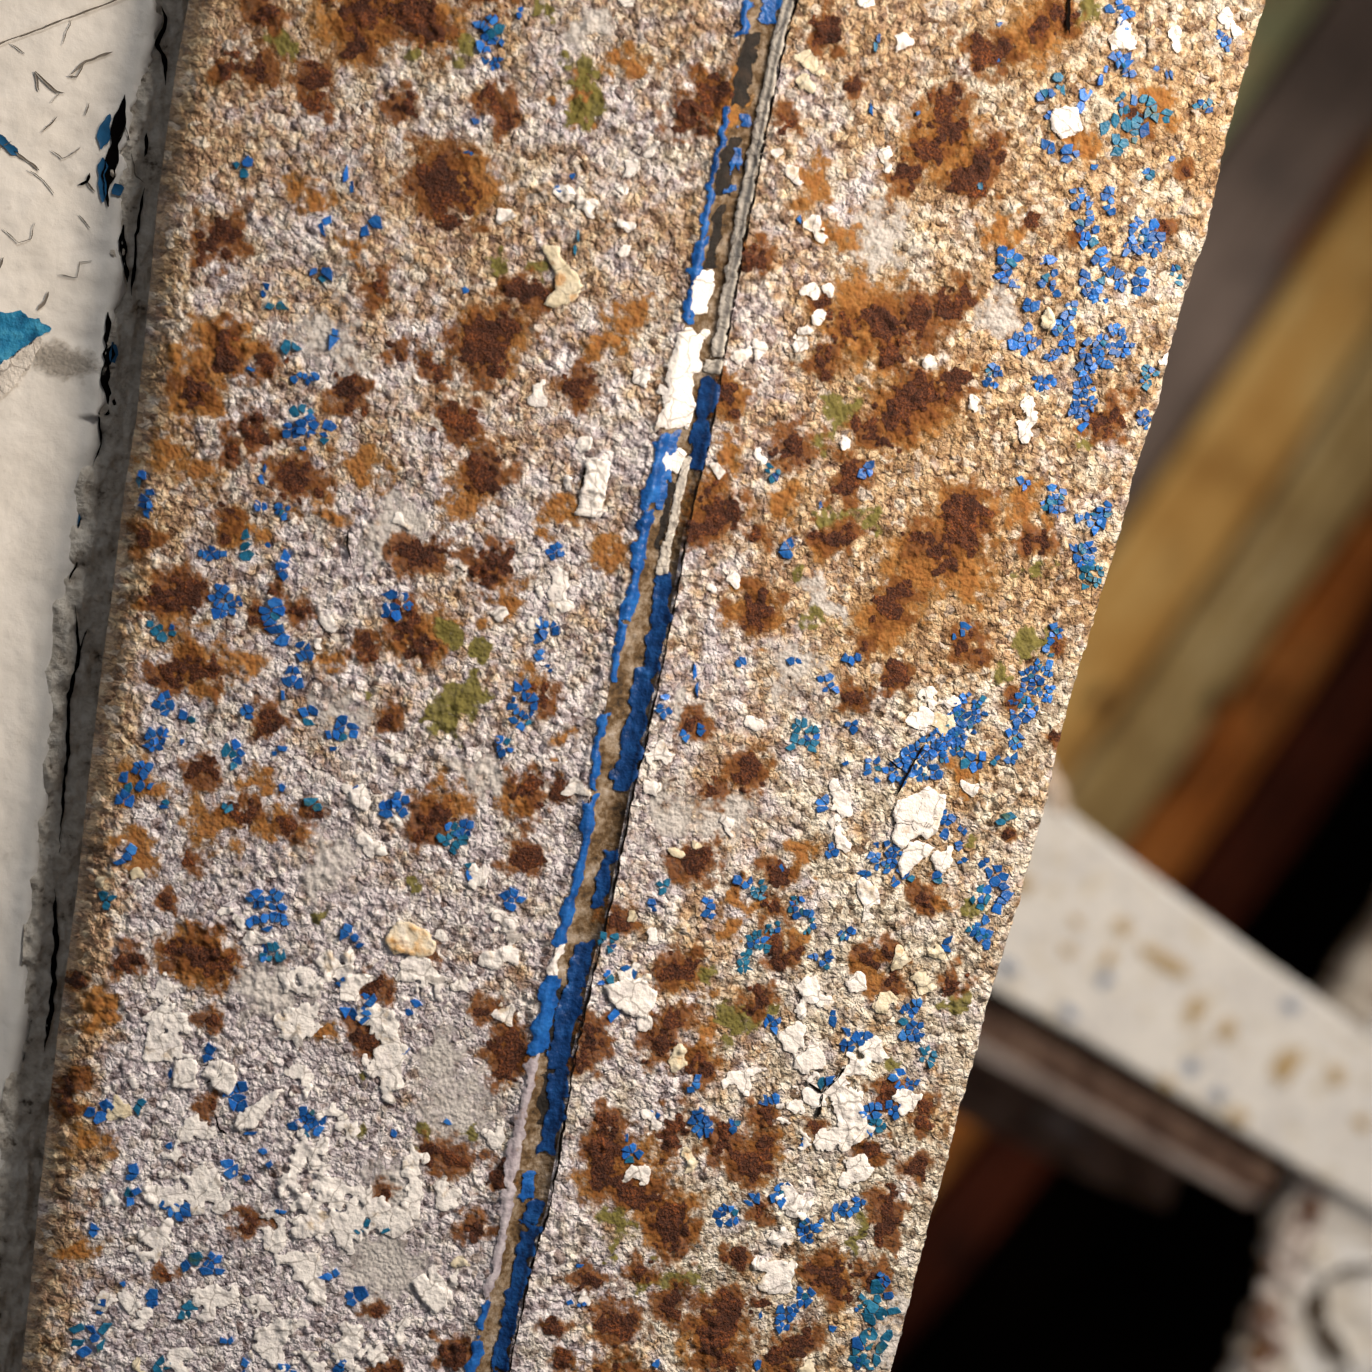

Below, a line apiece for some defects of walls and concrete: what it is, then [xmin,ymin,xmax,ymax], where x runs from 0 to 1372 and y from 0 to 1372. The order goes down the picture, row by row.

peeling [0,310,51,400]
crack [23,889,59,1062]
crack [59,562,87,853]
crack [0,0,148,465]
rust [64,749,330,1040]
rust [305,267,555,677]
peeling [84,0,828,1372]
crack [508,0,798,1372]
rust [535,835,957,1372]
rust [671,101,982,565]
rust [835,476,1060,714]
peeling [68,1281,158,1358]